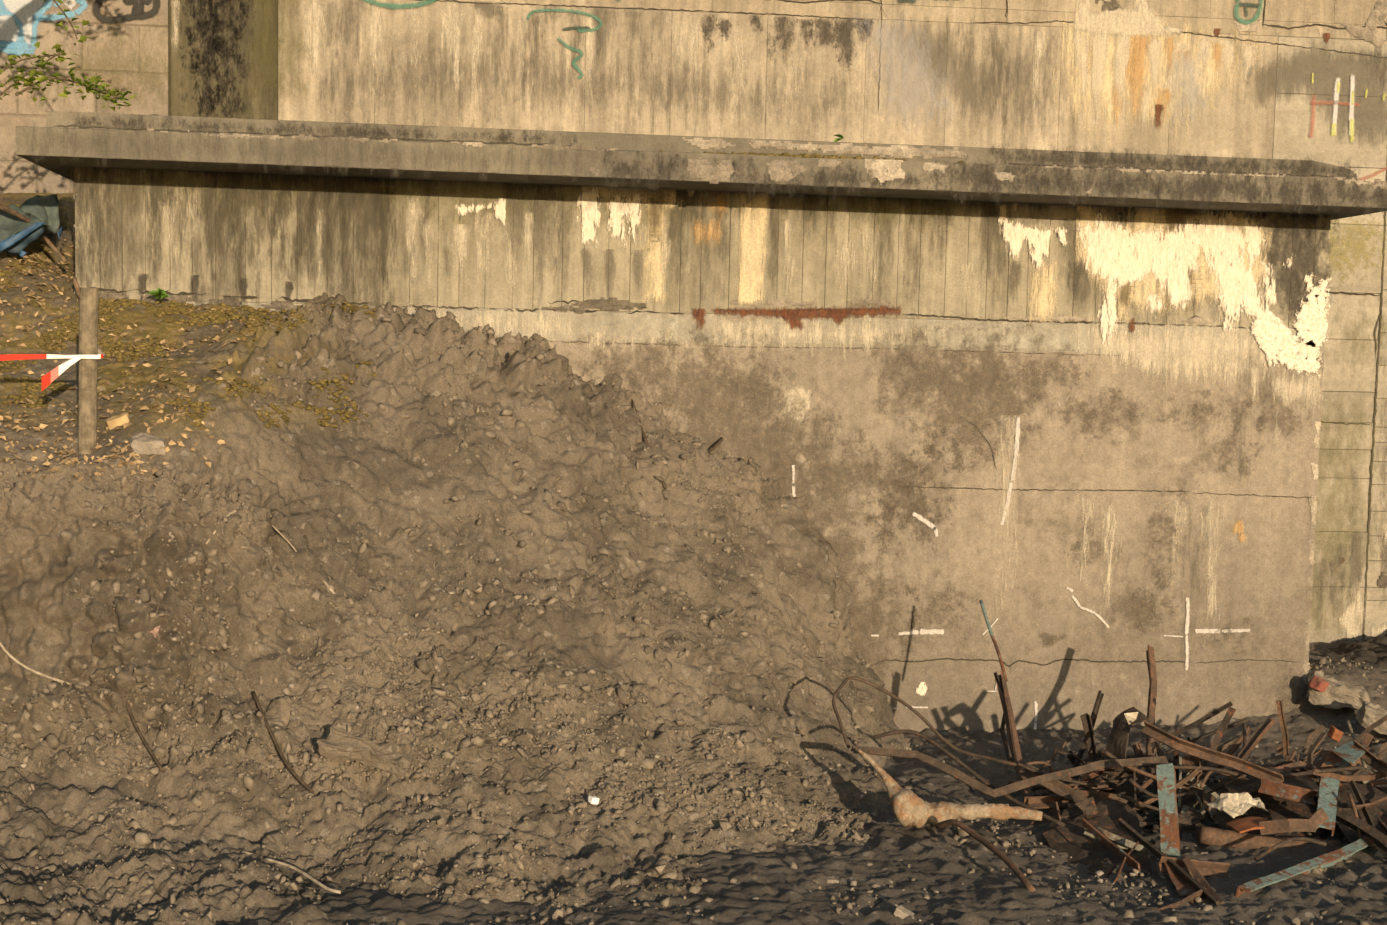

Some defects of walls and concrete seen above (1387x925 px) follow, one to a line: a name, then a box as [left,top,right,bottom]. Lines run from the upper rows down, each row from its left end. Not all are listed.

water stain [173,0,252,134]
water stain [441,5,482,89]
water stain [586,16,594,92]
water stain [674,15,873,68]
water stain [406,201,433,278]
water stain [714,162,931,352]
water stain [934,0,1387,439]
water stain [437,309,695,348]
rust [692,306,901,329]
peeling [998,211,1331,602]
crack [870,658,1295,673]
spalling [1303,620,1312,686]